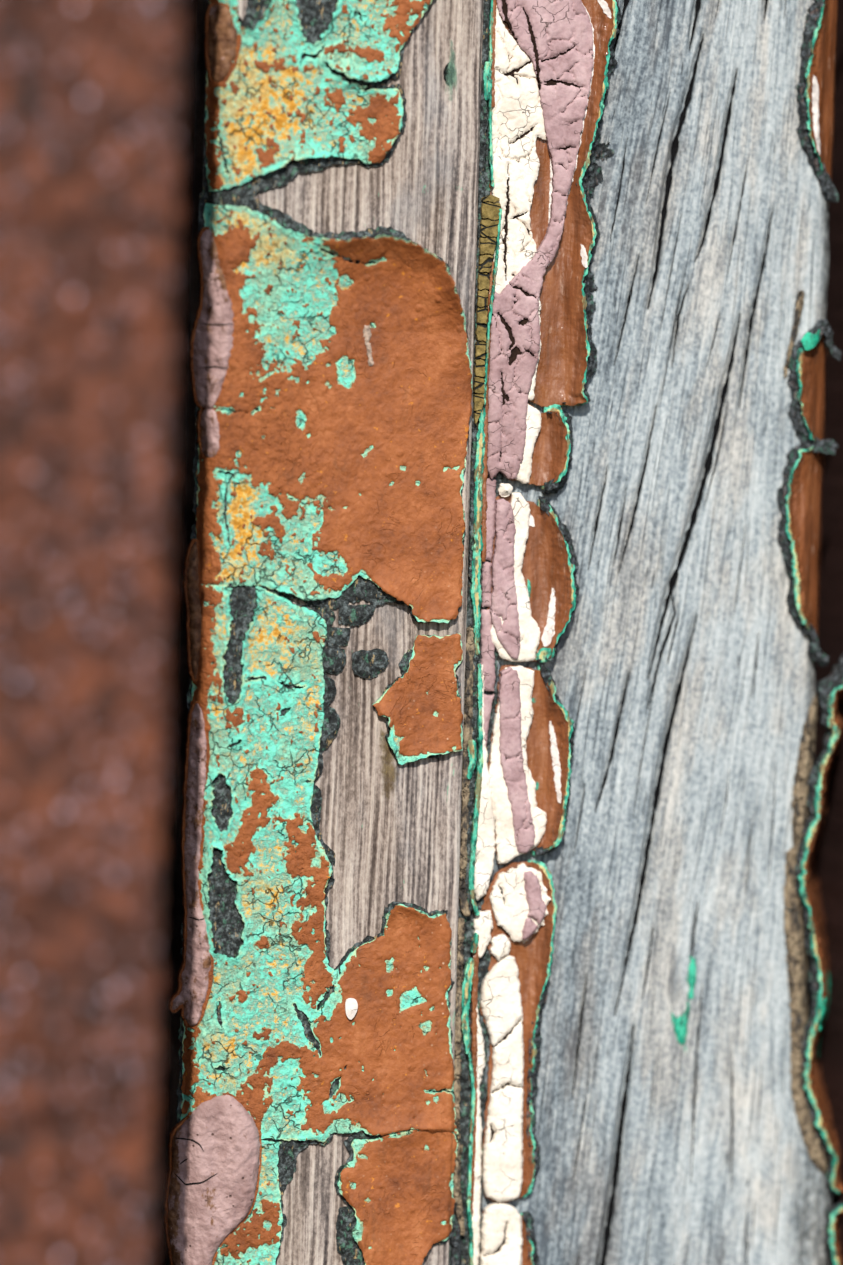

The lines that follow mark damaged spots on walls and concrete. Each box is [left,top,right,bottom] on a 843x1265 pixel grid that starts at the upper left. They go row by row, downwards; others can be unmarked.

crack [588,0,748,573]
crack [764,0,786,21]
peeling [801,329,820,350]
peeling [176,0,501,1265]
crack [572,206,776,1265]